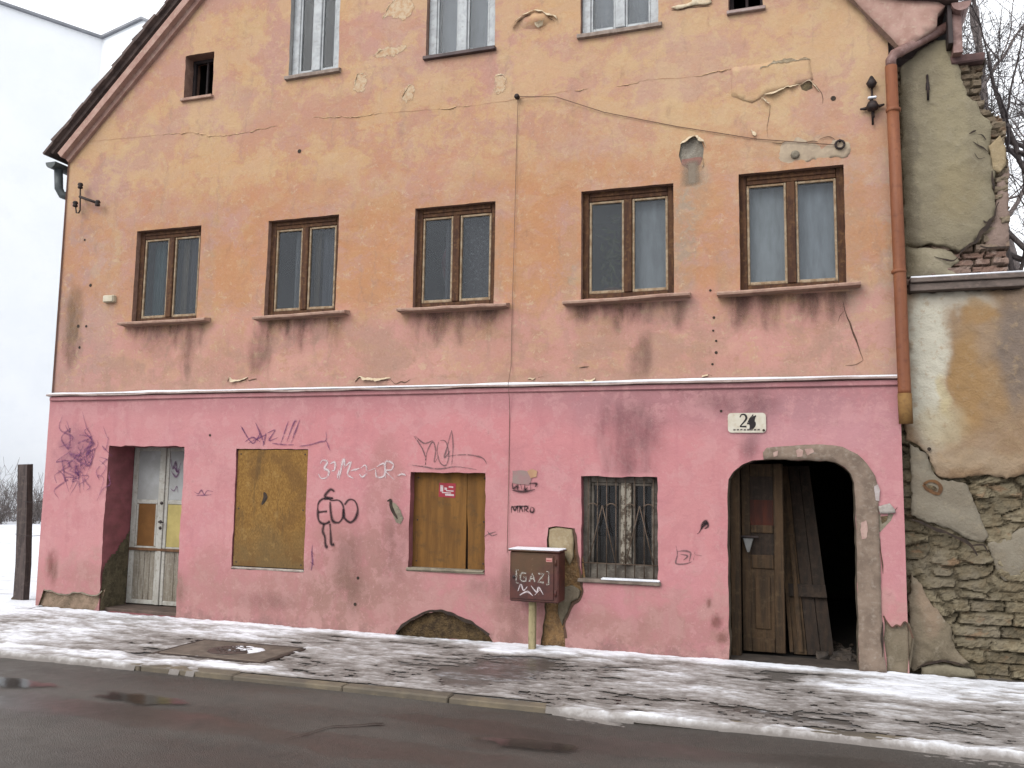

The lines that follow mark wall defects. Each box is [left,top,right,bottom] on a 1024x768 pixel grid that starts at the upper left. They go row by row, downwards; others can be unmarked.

flaking render [679,135,706,184]
crack [838,302,863,366]
peeling [860,484,898,571]
flaking render [40,531,130,611]
flaking render [396,609,493,642]
flaking render [542,526,585,647]